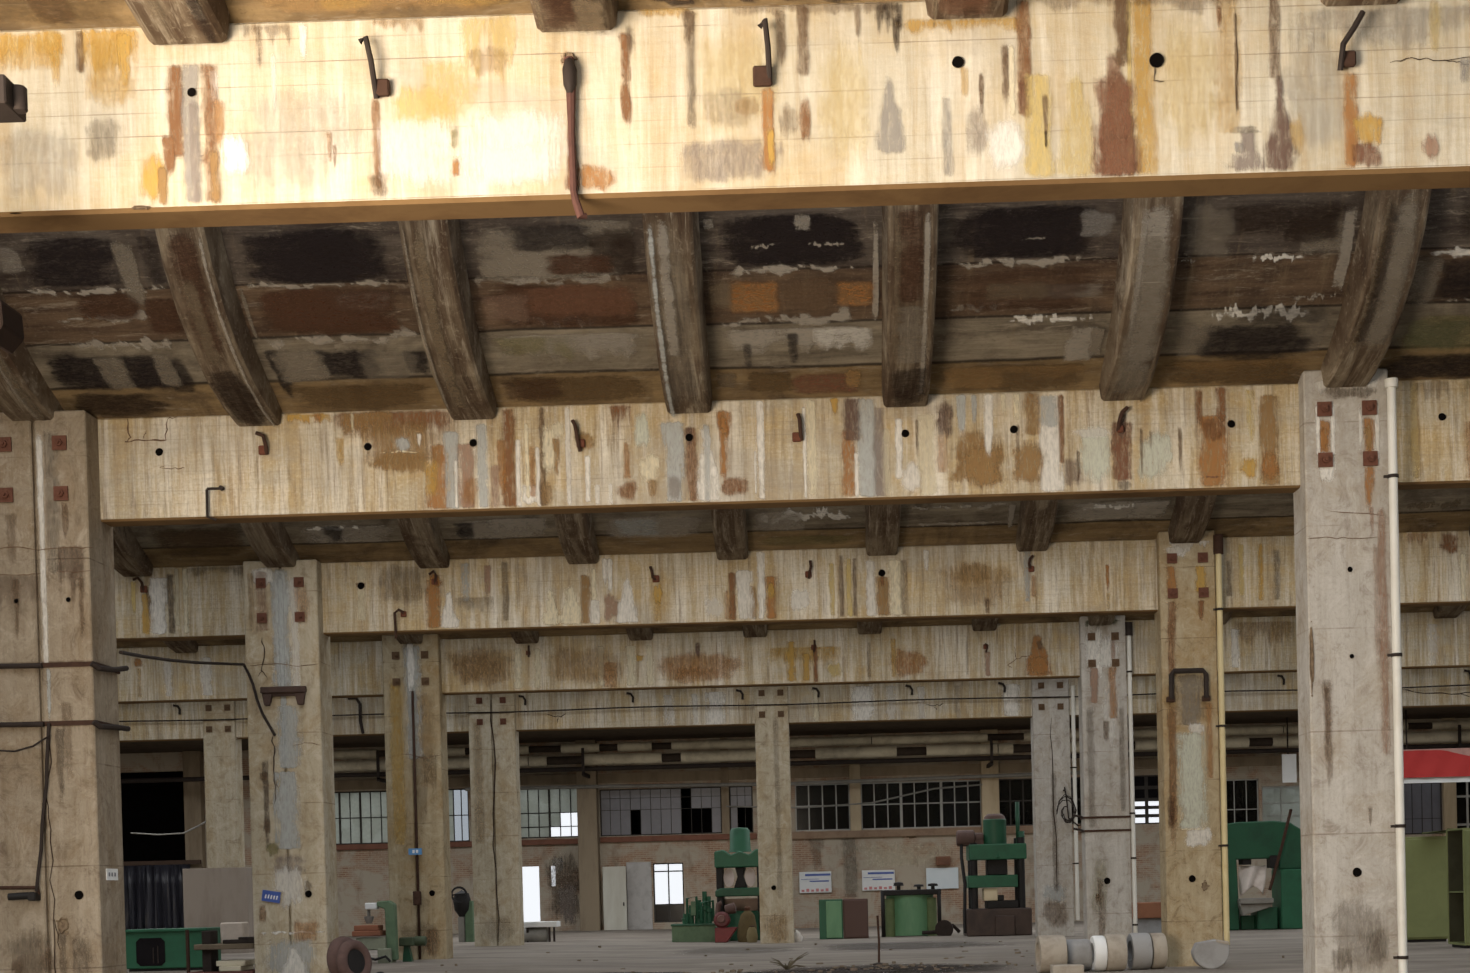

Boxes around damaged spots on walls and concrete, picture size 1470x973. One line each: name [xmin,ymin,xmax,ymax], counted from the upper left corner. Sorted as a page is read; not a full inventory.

corrosion [777,6,809,73]
corrosion [140,65,185,205]
corrosion [201,65,223,202]
corrosion [371,101,383,193]
corrosion [762,88,810,171]
corrosion [1093,0,1140,175]
corrosion [1343,74,1382,167]
corrosion [1026,636,1052,676]